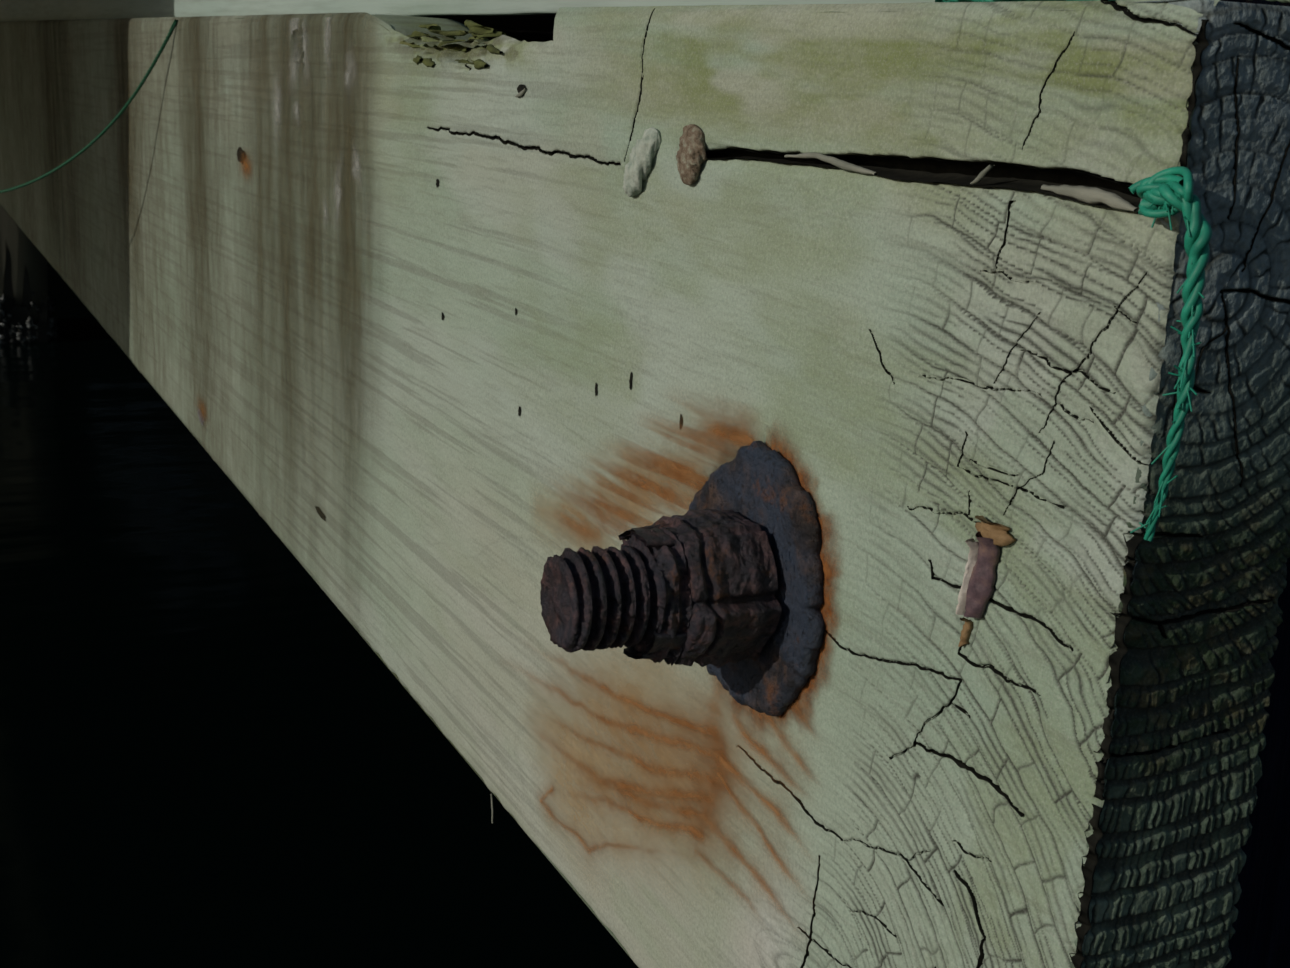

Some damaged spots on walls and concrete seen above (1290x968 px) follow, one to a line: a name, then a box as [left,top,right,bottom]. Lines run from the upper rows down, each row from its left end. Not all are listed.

leakage [292,12,366,312]
crack [706,31,1141,283]
crack [1100,0,1290,487]
rust [560,454,708,547]
rust [687,427,812,496]
crack [869,272,1151,523]
rust [623,647,673,659]
rust [540,677,788,898]
rust [733,511,837,777]
crack [738,745,992,968]
crack [825,630,1041,817]
crack [1069,531,1274,968]